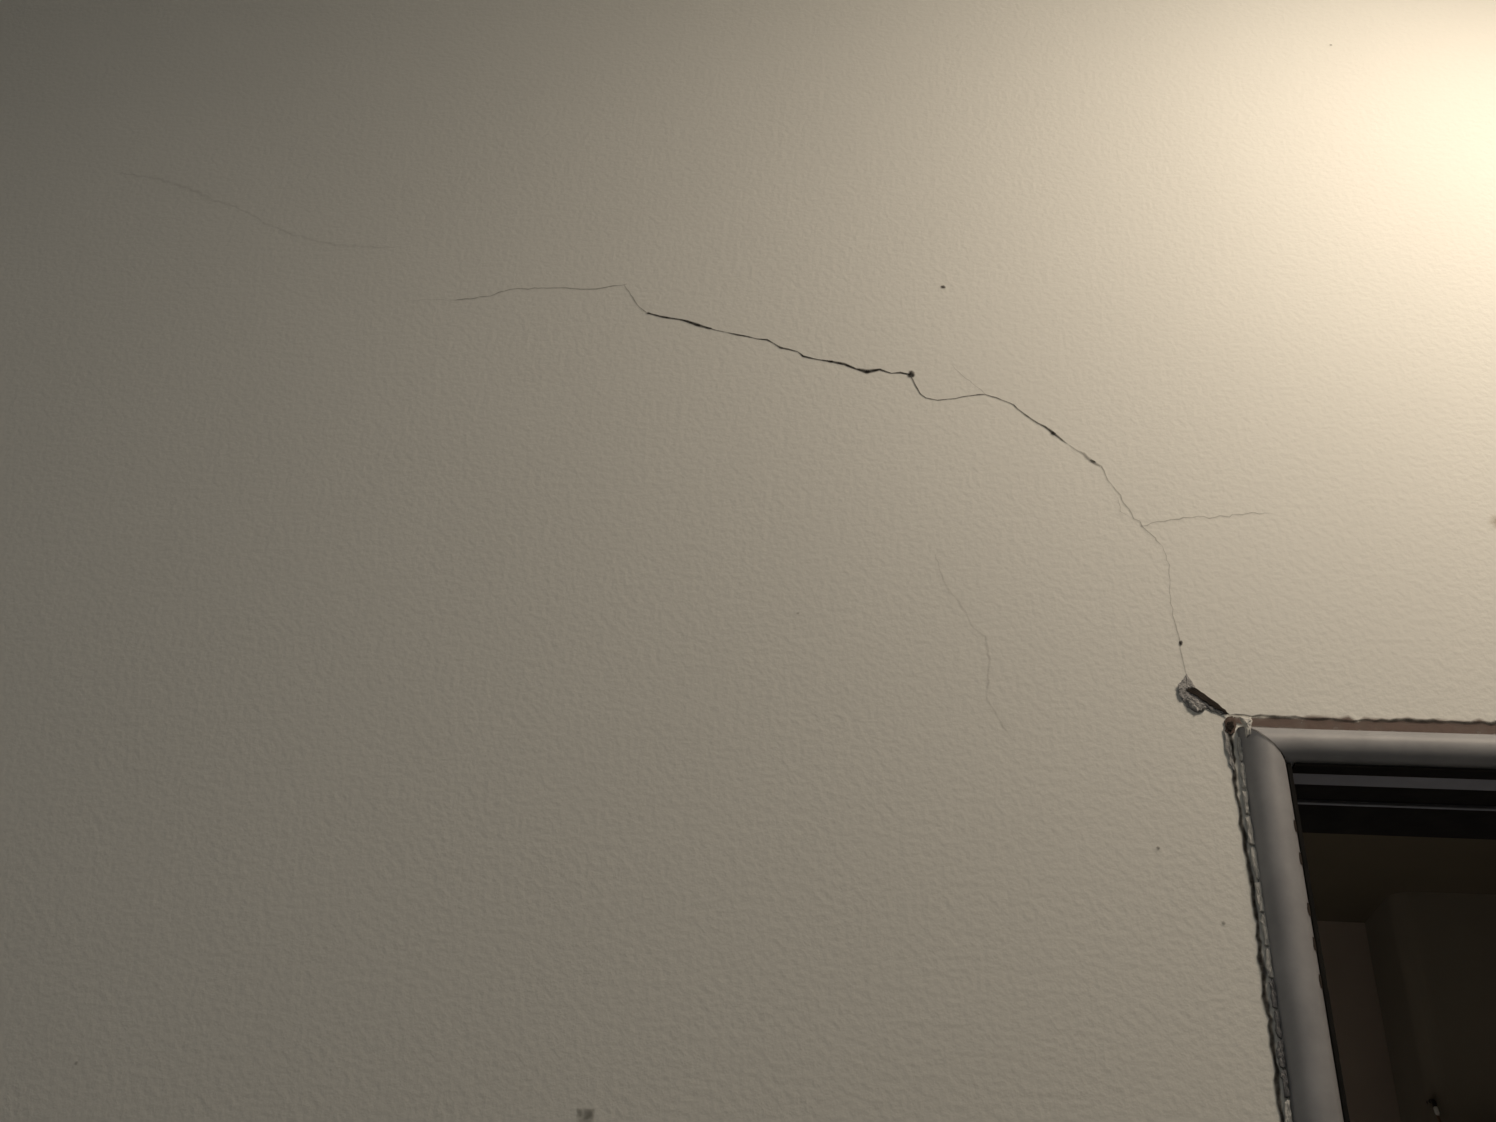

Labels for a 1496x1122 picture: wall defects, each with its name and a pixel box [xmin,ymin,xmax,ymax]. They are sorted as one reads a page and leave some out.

crack [647,312,1095,462]